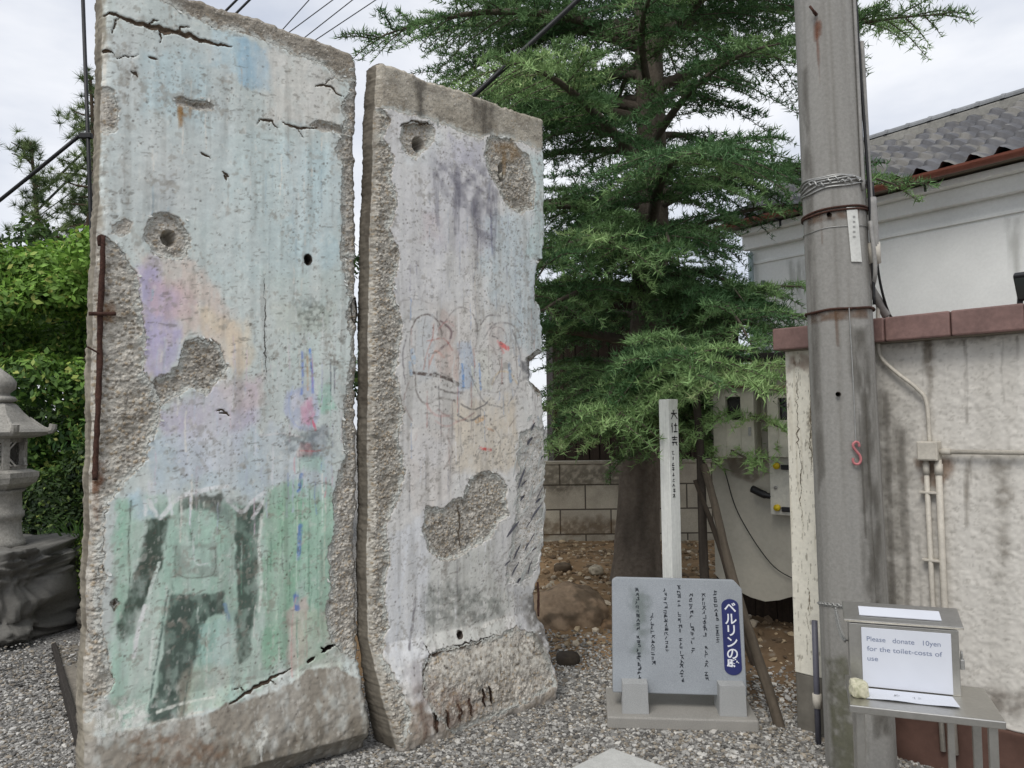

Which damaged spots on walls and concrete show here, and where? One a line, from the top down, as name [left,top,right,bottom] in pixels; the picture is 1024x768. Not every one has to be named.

crack [102,12,232,59]
crack [315,78,344,97]
crack [257,119,317,138]
spalling [162,0,557,748]
spalling [83,213,229,723]
crack [795,376,813,526]
crack [229,644,336,704]